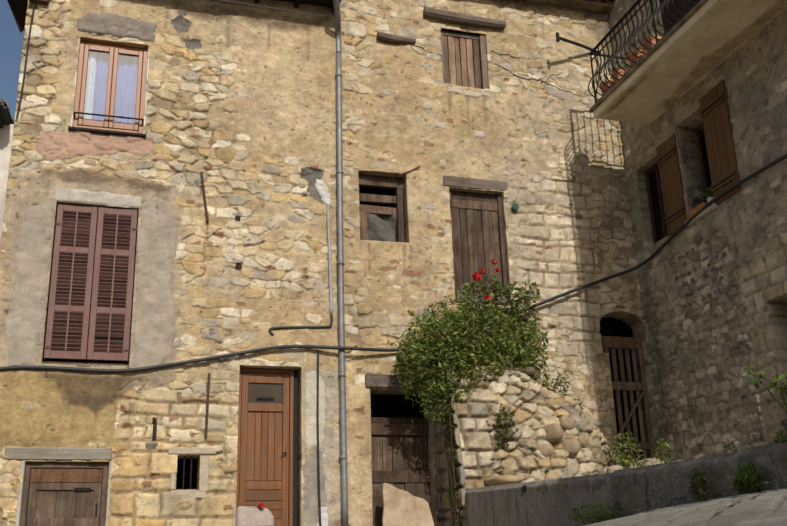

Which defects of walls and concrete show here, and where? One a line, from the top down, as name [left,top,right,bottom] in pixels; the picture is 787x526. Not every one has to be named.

crack [490,50,579,100]